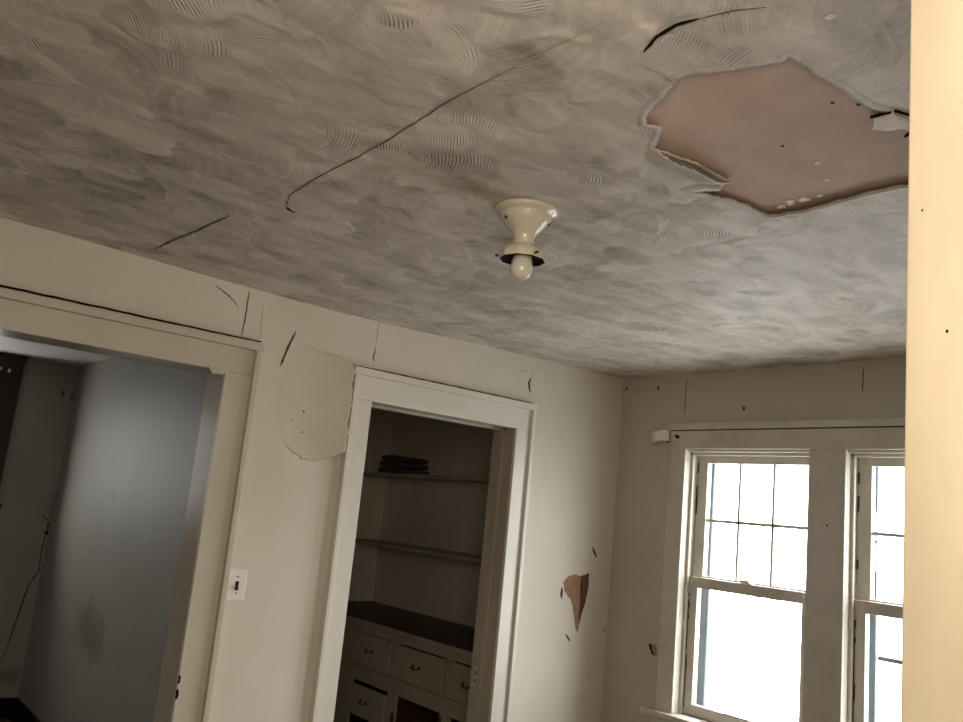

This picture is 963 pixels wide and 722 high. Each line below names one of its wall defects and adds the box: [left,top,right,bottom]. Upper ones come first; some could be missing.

crack [286,22,603,213]
flaking render [637,50,909,219]
crack [0,285,263,342]
crack [155,216,229,249]
crack [0,492,55,665]
peeling [560,571,590,641]